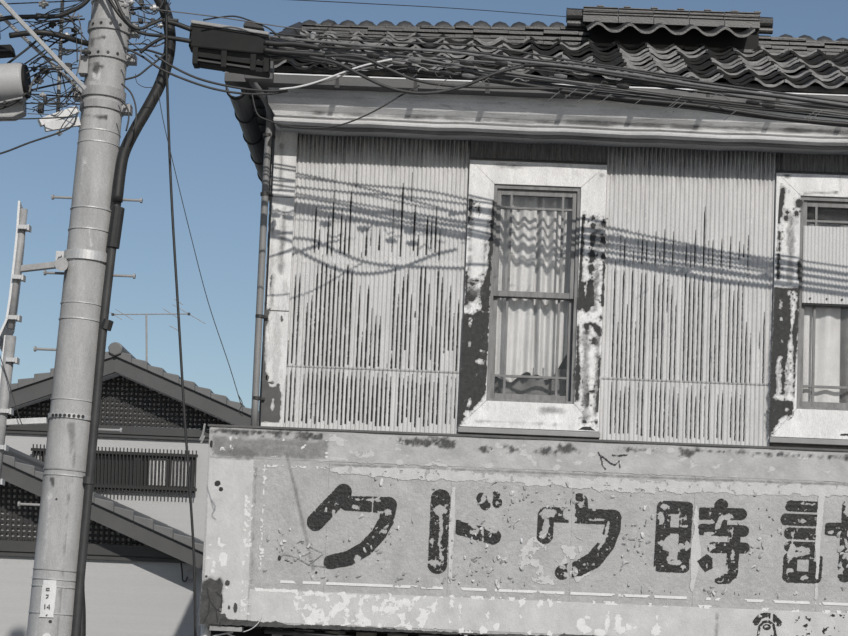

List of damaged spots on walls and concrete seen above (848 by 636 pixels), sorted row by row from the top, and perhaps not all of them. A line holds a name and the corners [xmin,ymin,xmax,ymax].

peeling [261,167,495,427]
peeling [573,187,803,441]